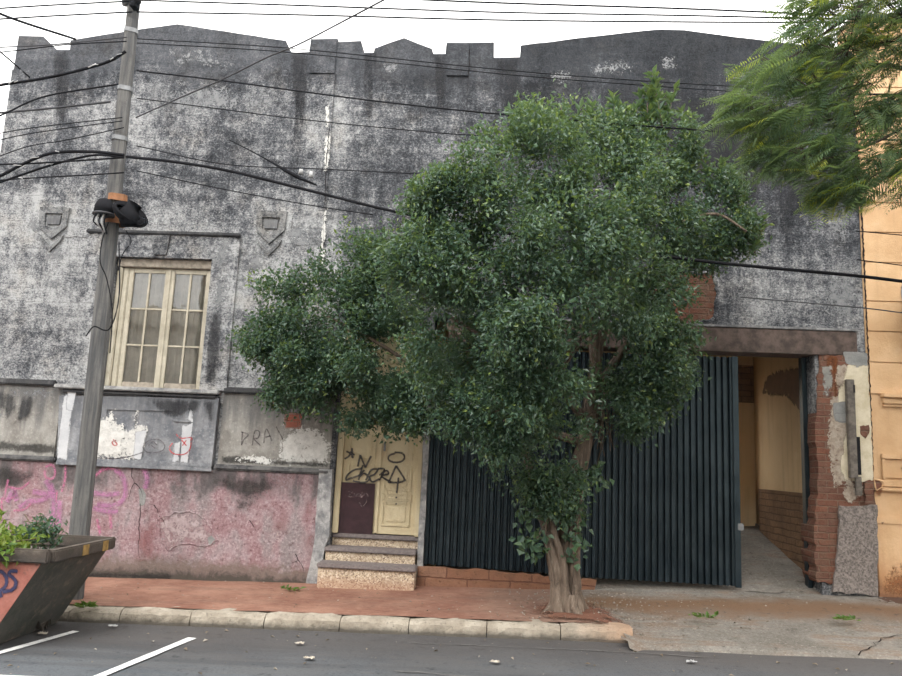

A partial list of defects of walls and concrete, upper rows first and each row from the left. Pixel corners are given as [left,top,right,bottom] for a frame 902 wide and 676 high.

water stain [206,315,220,381]
flaking render [738,365,800,410]
water stain [0,392,76,460]
peeling [97,411,148,461]
peeling [235,413,332,466]
peeling [827,364,884,504]
crack [128,468,165,558]